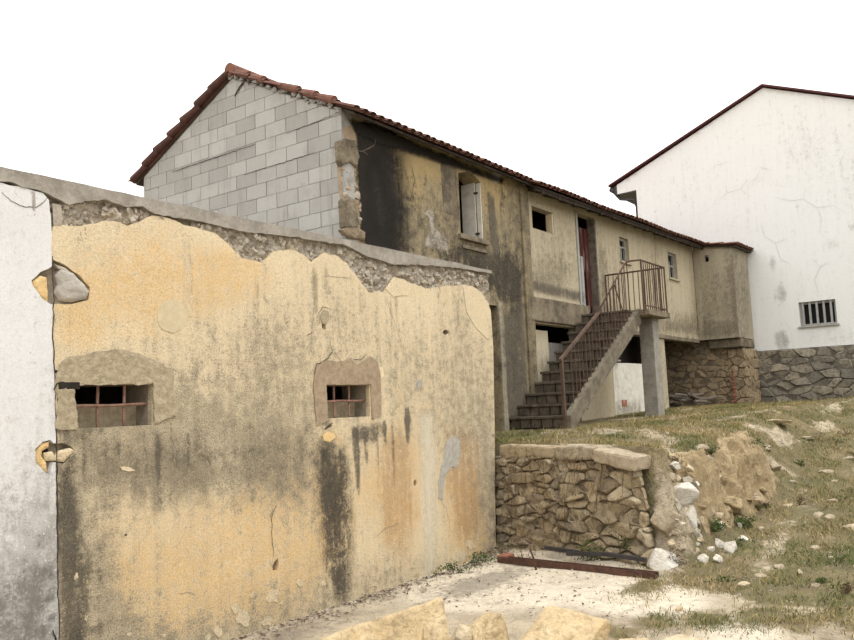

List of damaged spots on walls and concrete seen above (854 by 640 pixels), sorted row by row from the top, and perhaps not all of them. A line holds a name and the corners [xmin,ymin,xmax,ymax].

spalling [32,263,89,303]
spalling [47,197,167,226]
spalling [189,125,489,339]
water stain [458,193,519,300]
water stain [504,312,527,417]
spalling [35,441,74,472]
water stain [62,475,80,640]
water stain [317,421,394,600]